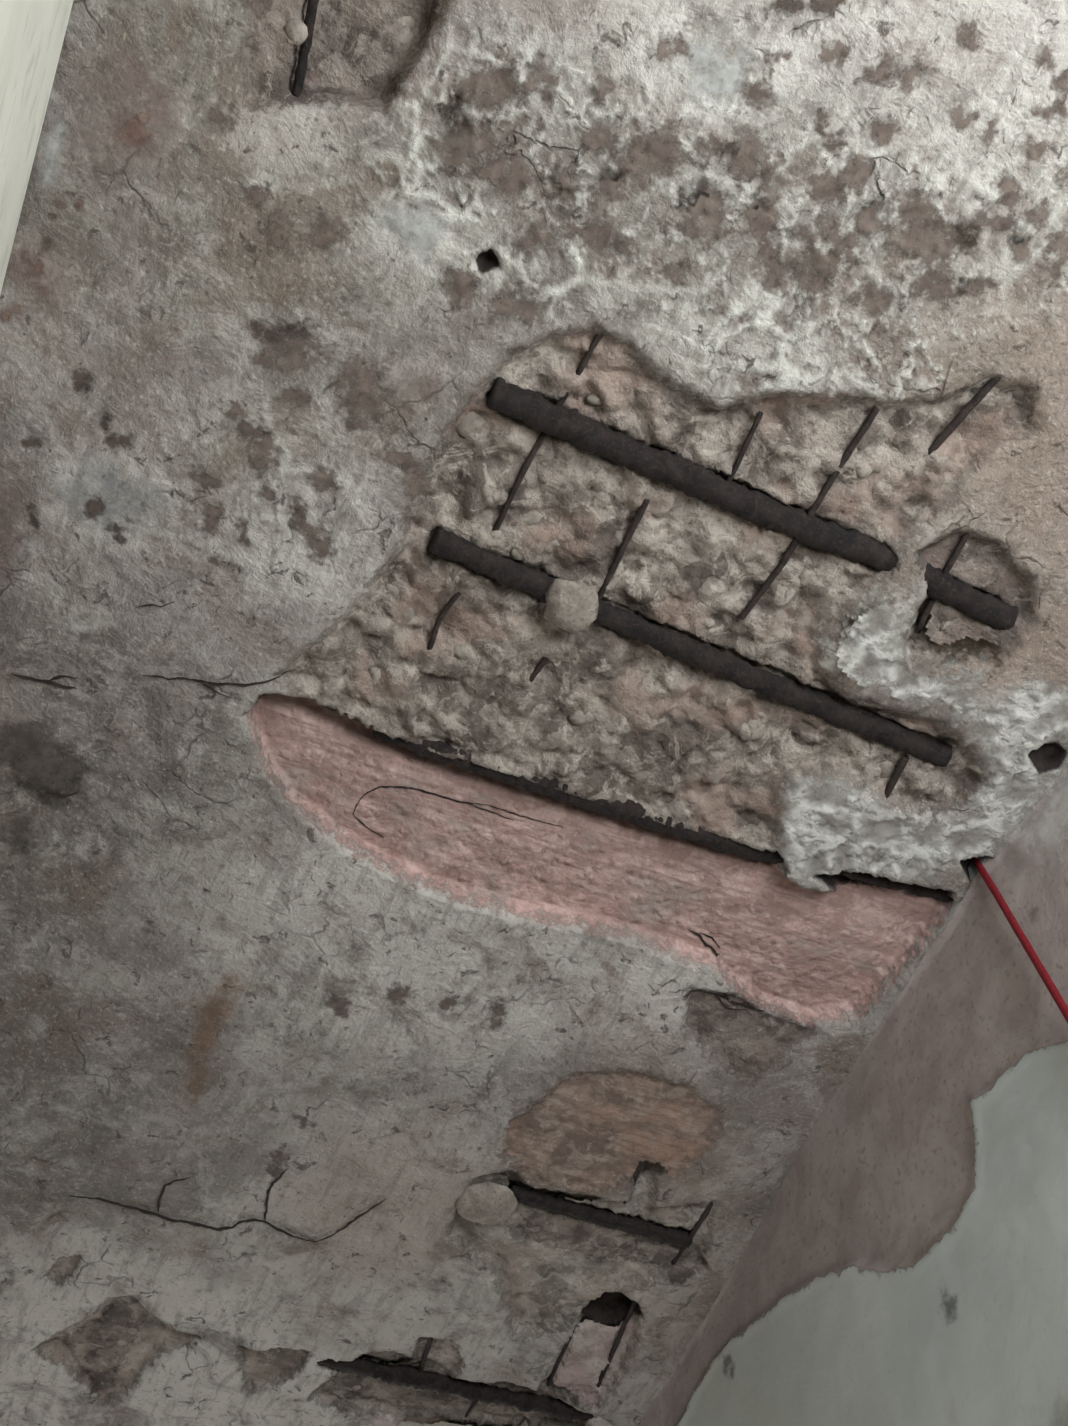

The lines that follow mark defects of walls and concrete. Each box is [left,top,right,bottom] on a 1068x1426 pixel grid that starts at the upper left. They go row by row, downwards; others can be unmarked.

spalling [207,0,451,131]
peeling [656,32,693,61]
peeling [433,49,559,196]
peeling [441,266,552,325]
peeling [247,319,320,407]
peeling [191,472,250,547]
peeling [227,400,342,566]
spalling [277,324,1039,864]
peeling [237,769,1068,1426]
crack [69,1168,387,1242]
spalling [44,1255,81,1286]
spalling [34,1296,201,1404]